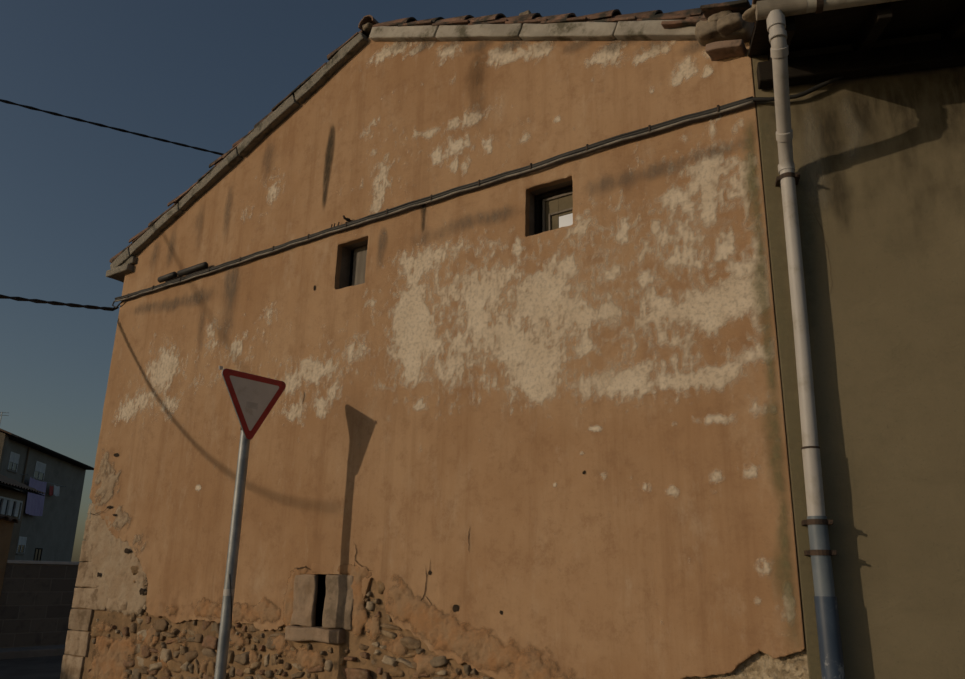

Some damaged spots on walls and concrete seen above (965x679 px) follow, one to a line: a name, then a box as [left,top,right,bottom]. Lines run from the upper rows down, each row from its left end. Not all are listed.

peeling [370,41,461,66]
peeling [475,40,552,66]
peeling [586,42,624,66]
peeling [633,41,675,65]
peeling [361,150,395,213]
peeling [379,112,773,413]
peeling [204,321,247,361]
peeling [115,346,188,423]
peeling [280,335,366,422]
peeling [705,415,733,424]
flaking render [72,502,494,679]
flaking render [684,649,809,679]